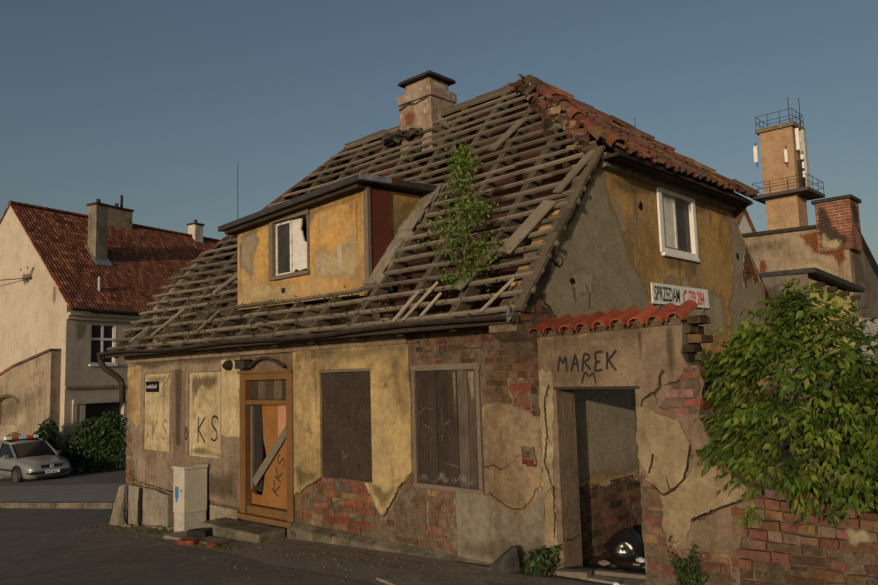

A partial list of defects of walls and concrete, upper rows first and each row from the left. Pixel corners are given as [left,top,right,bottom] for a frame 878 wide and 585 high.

peeling [800,262,837,276]
flaking render [410,327,541,416]
crack [640,369,680,407]
flaking render [299,477,379,534]
flaking render [422,473,469,551]
spalling [519,446,537,467]
crack [484,384,580,551]
peeling [574,389,732,585]
crack [652,445,692,496]